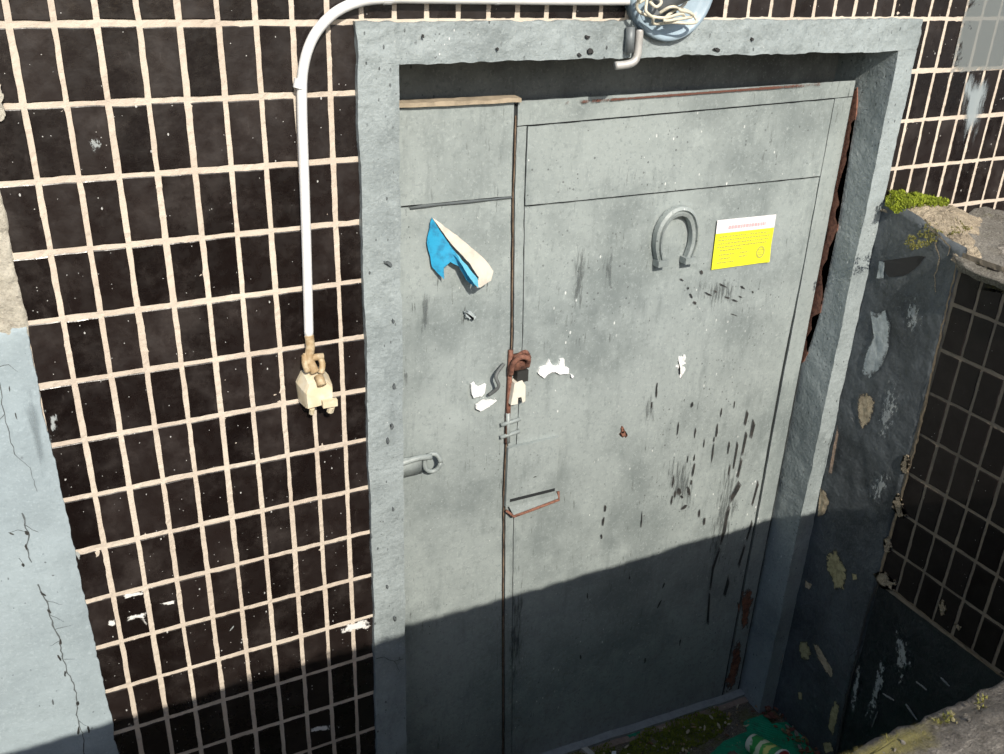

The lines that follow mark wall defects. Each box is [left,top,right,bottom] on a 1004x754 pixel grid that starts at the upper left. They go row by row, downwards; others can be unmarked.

rust [801,87,858,363]
peeling [862,311,891,378]
crack [0,364,37,490]
flaking render [858,393,875,429]
flaking render [818,488,829,517]
spalling [891,493,908,518]
flaking render [826,549,857,590]
spalling [873,572,897,590]
crack [10,513,86,754]
flaking render [799,641,833,677]
flaking render [822,701,839,754]